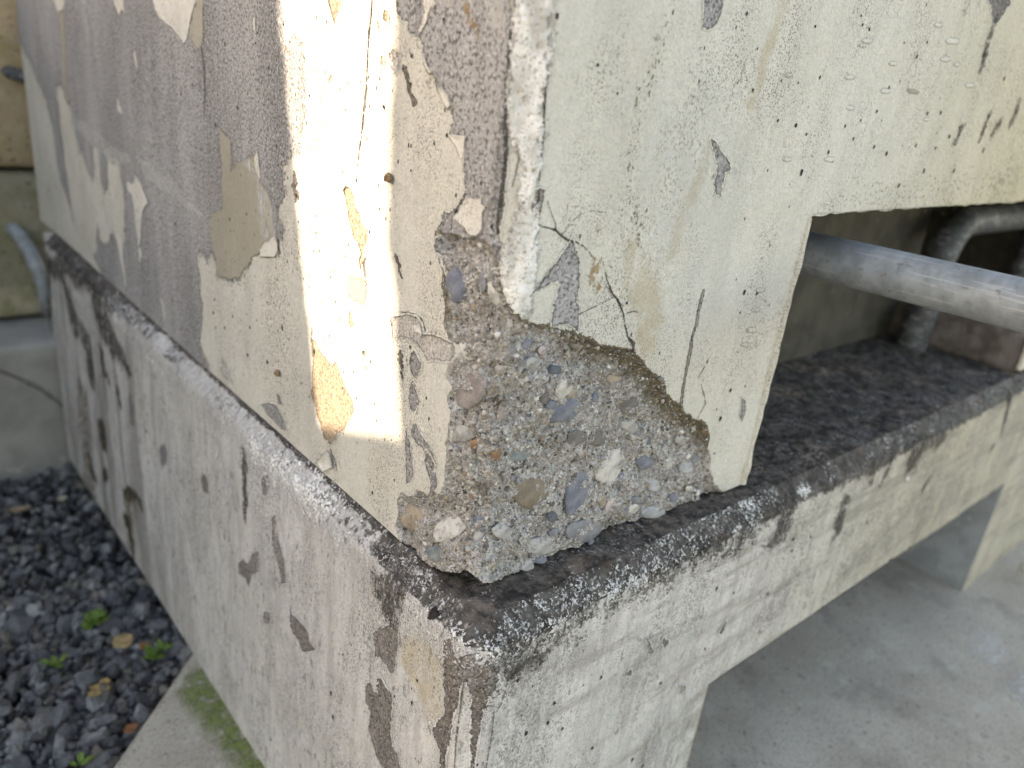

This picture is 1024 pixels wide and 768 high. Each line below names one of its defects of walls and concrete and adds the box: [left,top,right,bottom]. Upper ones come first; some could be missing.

peeling [16,0,308,385]
crack [496,0,638,352]
peeling [709,135,732,198]
peeling [310,336,355,472]
spalling [375,0,724,584]
crack [678,289,710,418]
leakage [692,492,798,564]
leakage [832,493,858,543]
leakage [867,428,946,487]